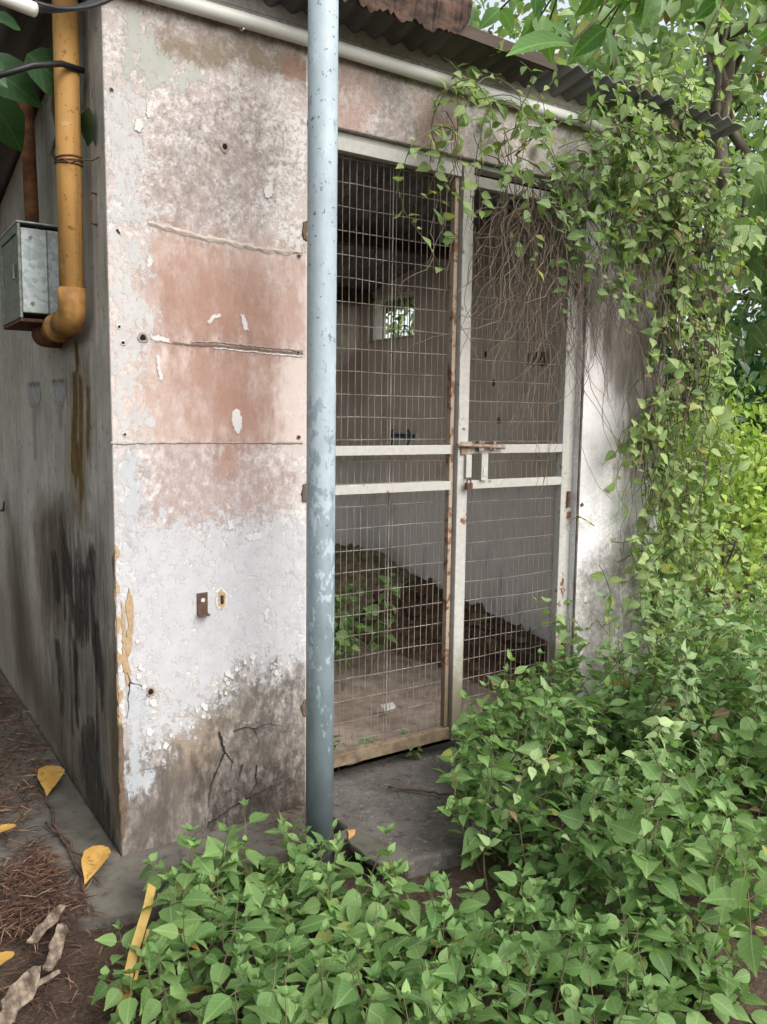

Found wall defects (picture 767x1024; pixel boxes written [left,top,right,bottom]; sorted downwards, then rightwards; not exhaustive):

rust [71,343,90,503]
peeling [104,5,306,846]
water stain [584,272,647,466]
water stain [14,512,305,853]
crack [141,723,290,823]